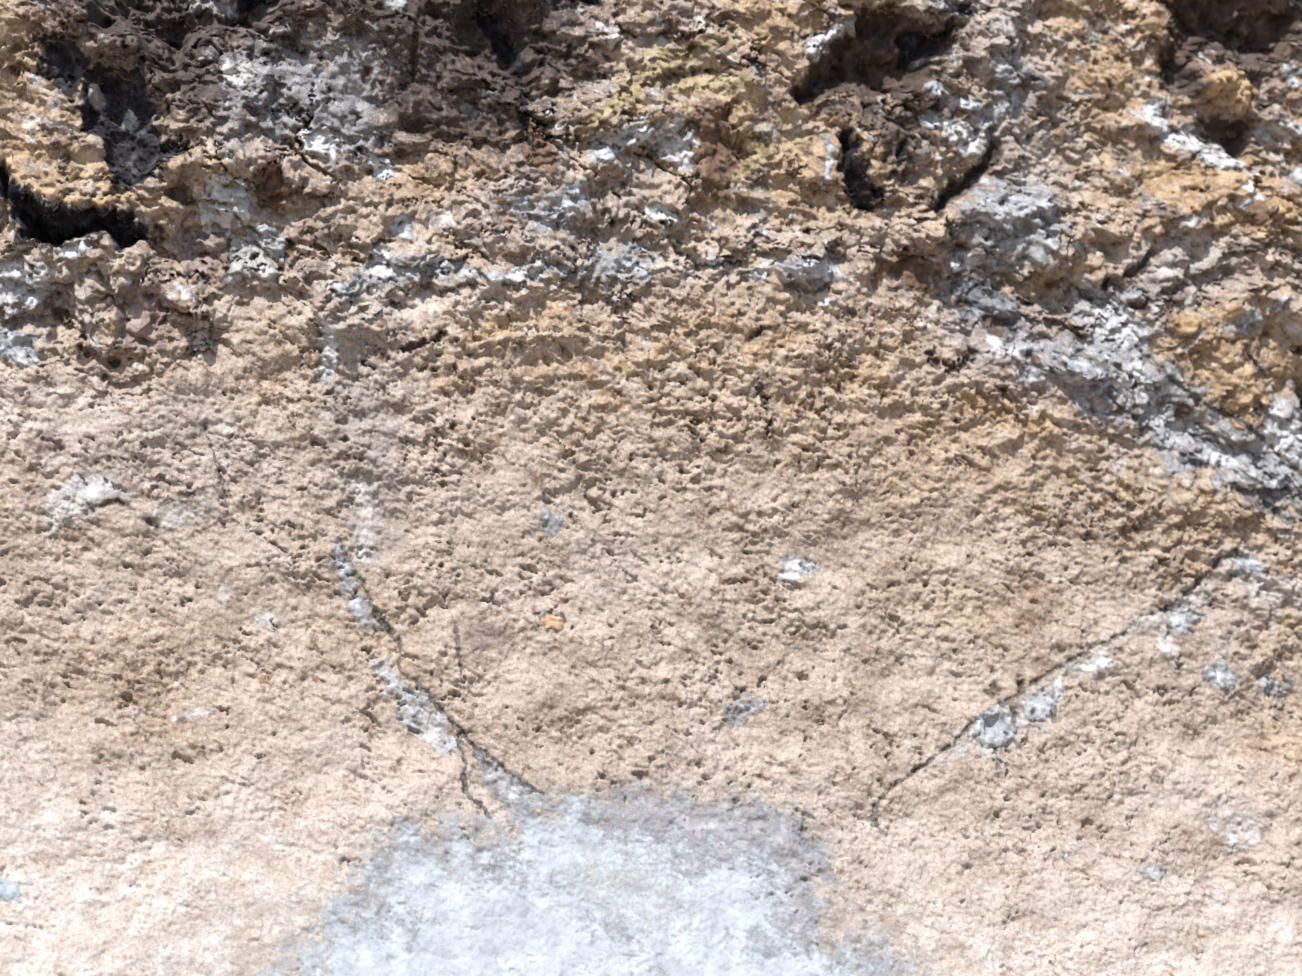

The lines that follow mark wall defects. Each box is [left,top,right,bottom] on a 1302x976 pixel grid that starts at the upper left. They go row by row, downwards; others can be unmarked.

damp [872,176,1302,524]
damp [371,655,460,756]
crack [341,547,544,819]
crack [789,646,952,658]
crack [869,538,1243,828]
damp [188,760,943,976]